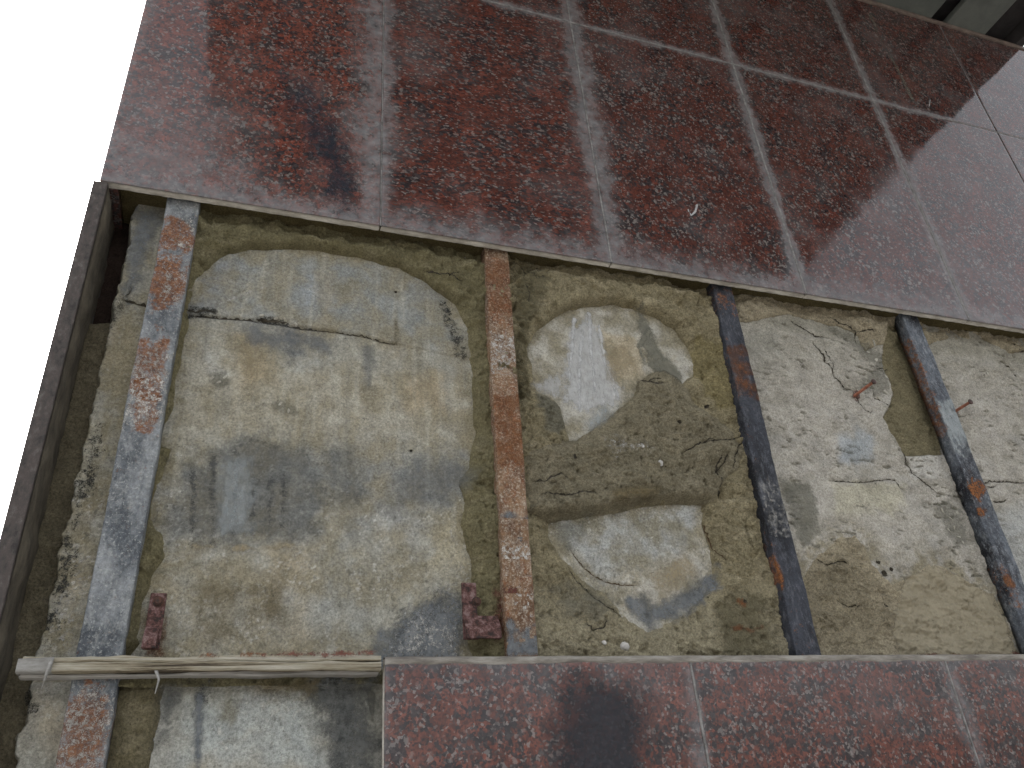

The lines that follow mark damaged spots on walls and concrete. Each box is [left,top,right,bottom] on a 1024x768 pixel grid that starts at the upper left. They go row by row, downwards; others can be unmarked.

crack [187,309,389,344]
crack [791,317,889,413]
rust [967,470,987,516]